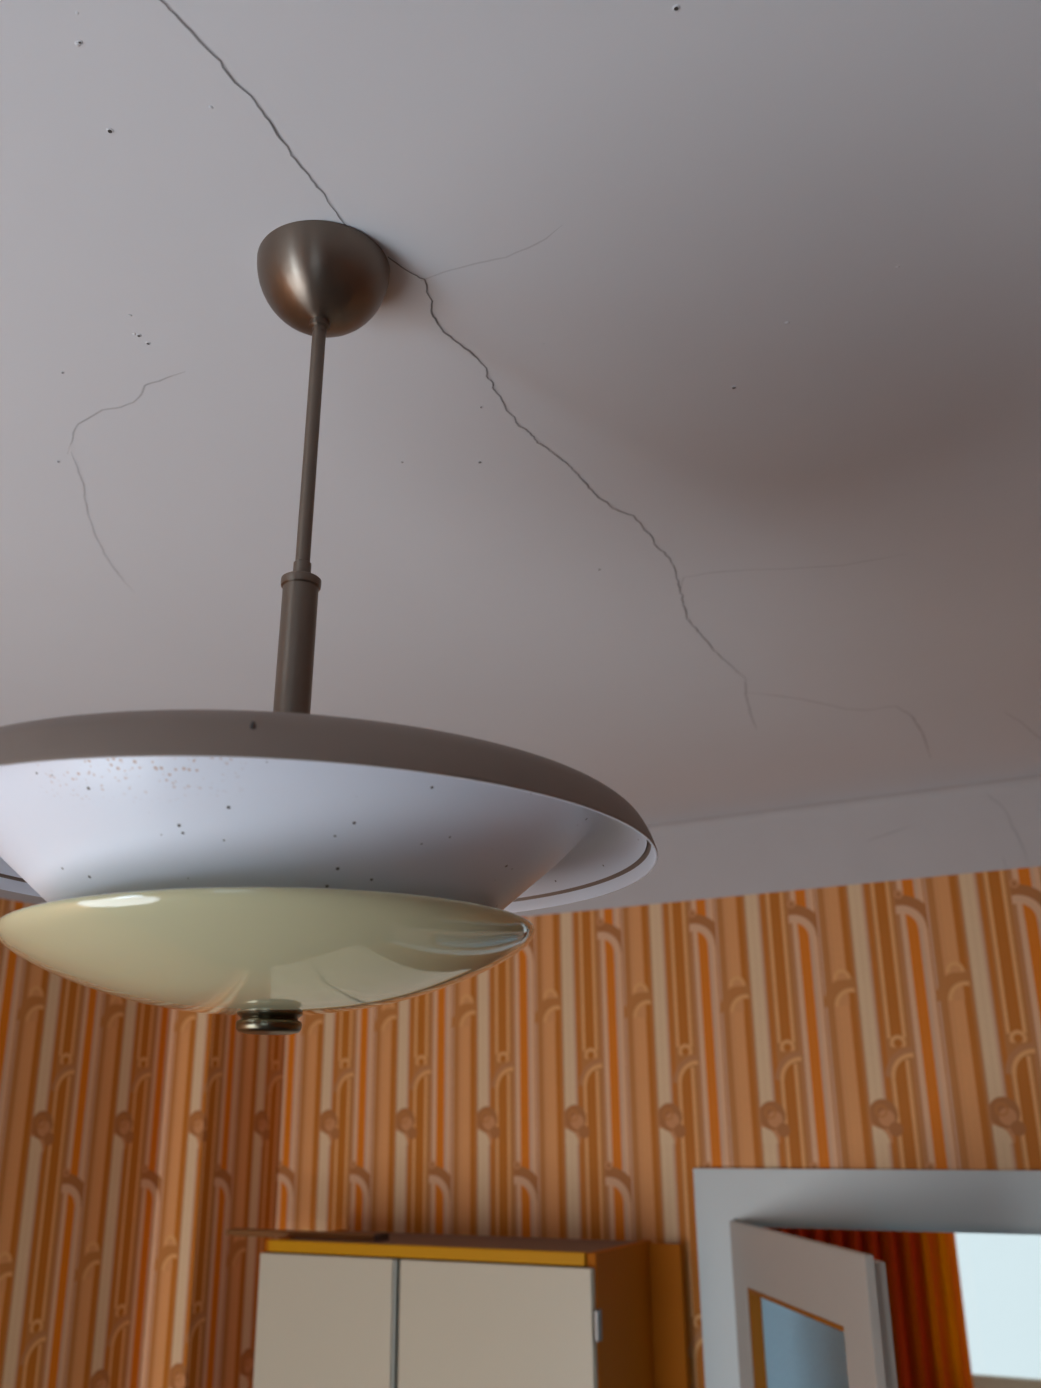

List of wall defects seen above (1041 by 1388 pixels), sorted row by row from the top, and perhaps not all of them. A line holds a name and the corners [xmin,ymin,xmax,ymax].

crack [160,0,345,225]
crack [388,257,746,679]